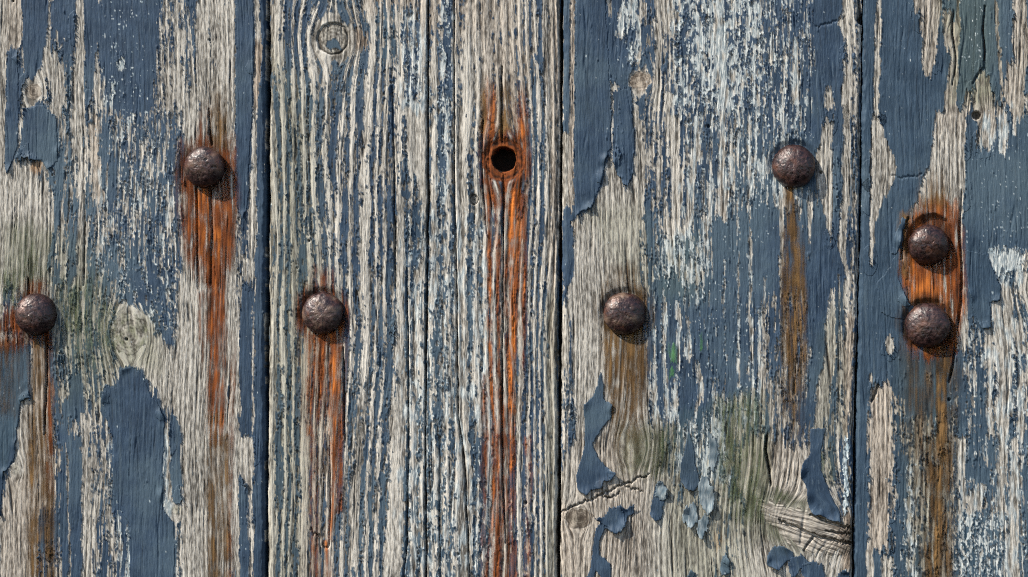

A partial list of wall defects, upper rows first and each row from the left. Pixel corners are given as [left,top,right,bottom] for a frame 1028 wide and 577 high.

peeling [0,344,46,577]
rust [0,283,53,577]
peeling [0,0,92,380]
rust [176,102,234,577]
peeling [235,0,266,292]
rust [296,274,348,577]
rust [480,92,530,577]
peeling [566,0,653,496]
rust [602,268,647,423]
peeling [863,377,900,558]
peeling [815,0,1028,444]
rust [902,185,965,577]